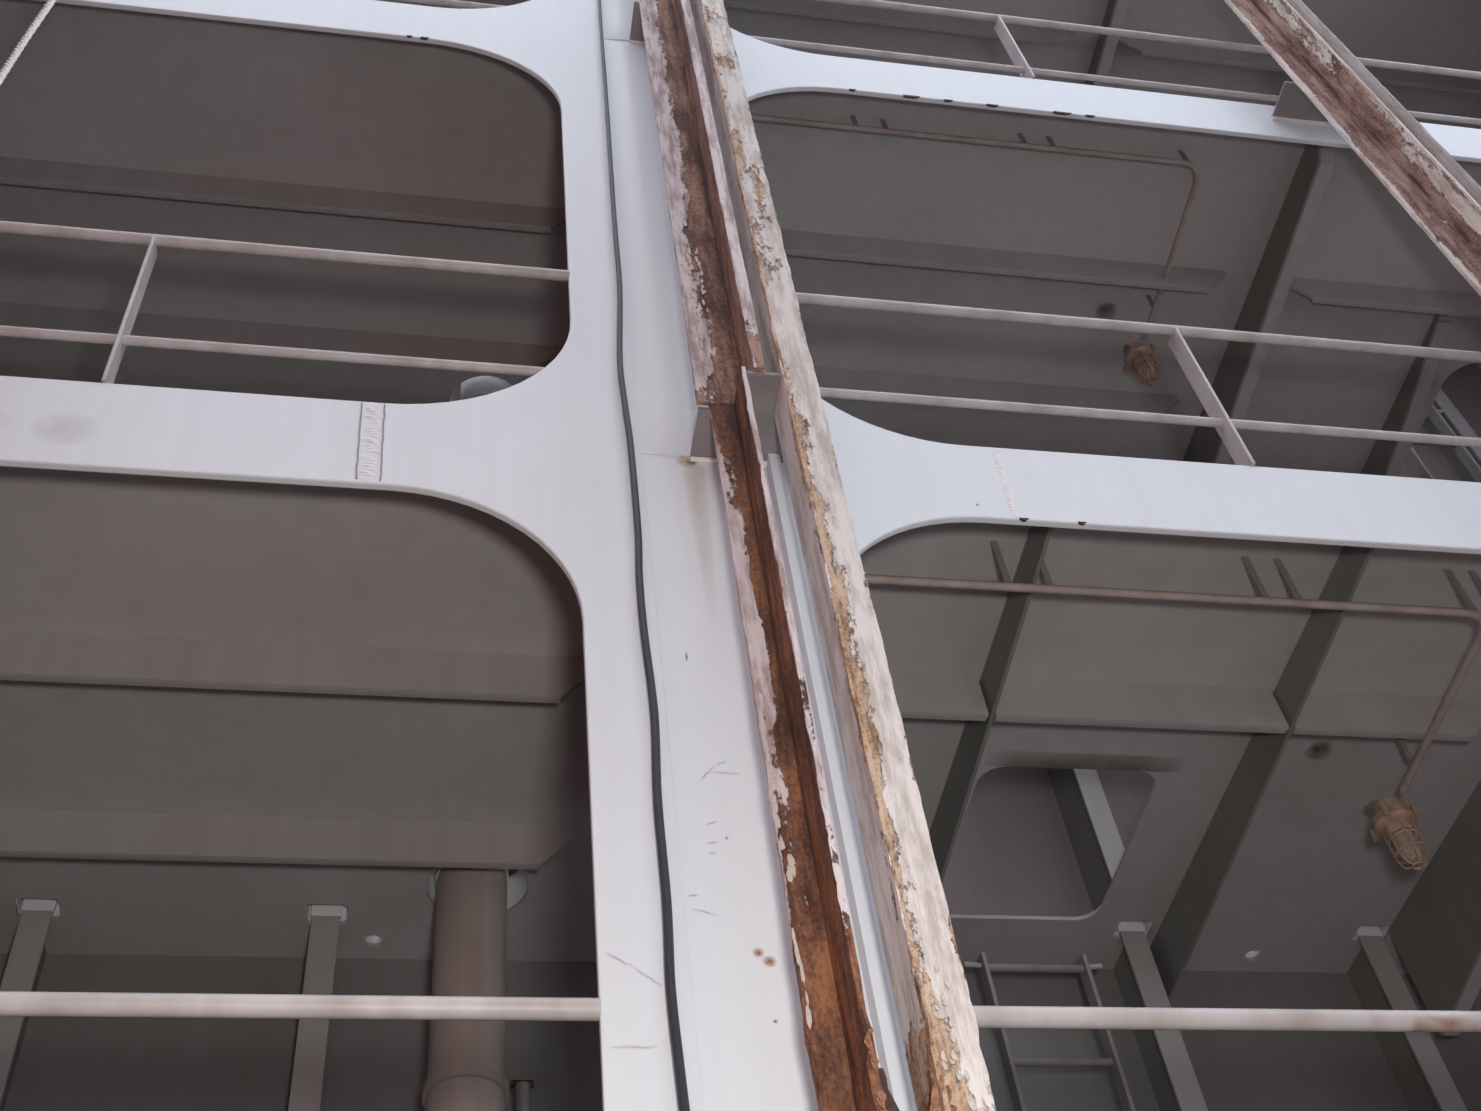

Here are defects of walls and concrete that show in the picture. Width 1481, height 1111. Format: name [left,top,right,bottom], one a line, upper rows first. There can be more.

peeling [920,961,985,1111]